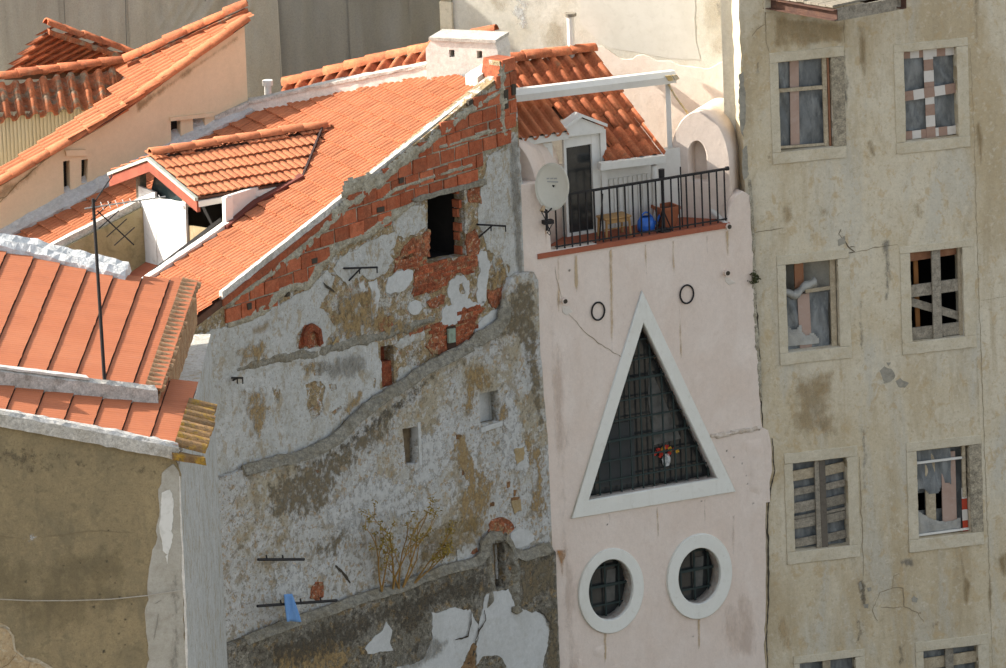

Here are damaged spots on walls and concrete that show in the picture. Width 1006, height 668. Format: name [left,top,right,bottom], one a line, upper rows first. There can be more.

peeling [199,57,525,475]
flaking render [488,481,522,535]
crack [857,457,865,573]
spalling [179,476,188,668]
flaking render [310,582,324,600]
crack [872,574,924,622]
peeling [0,623,52,668]
spalling [461,643,477,668]